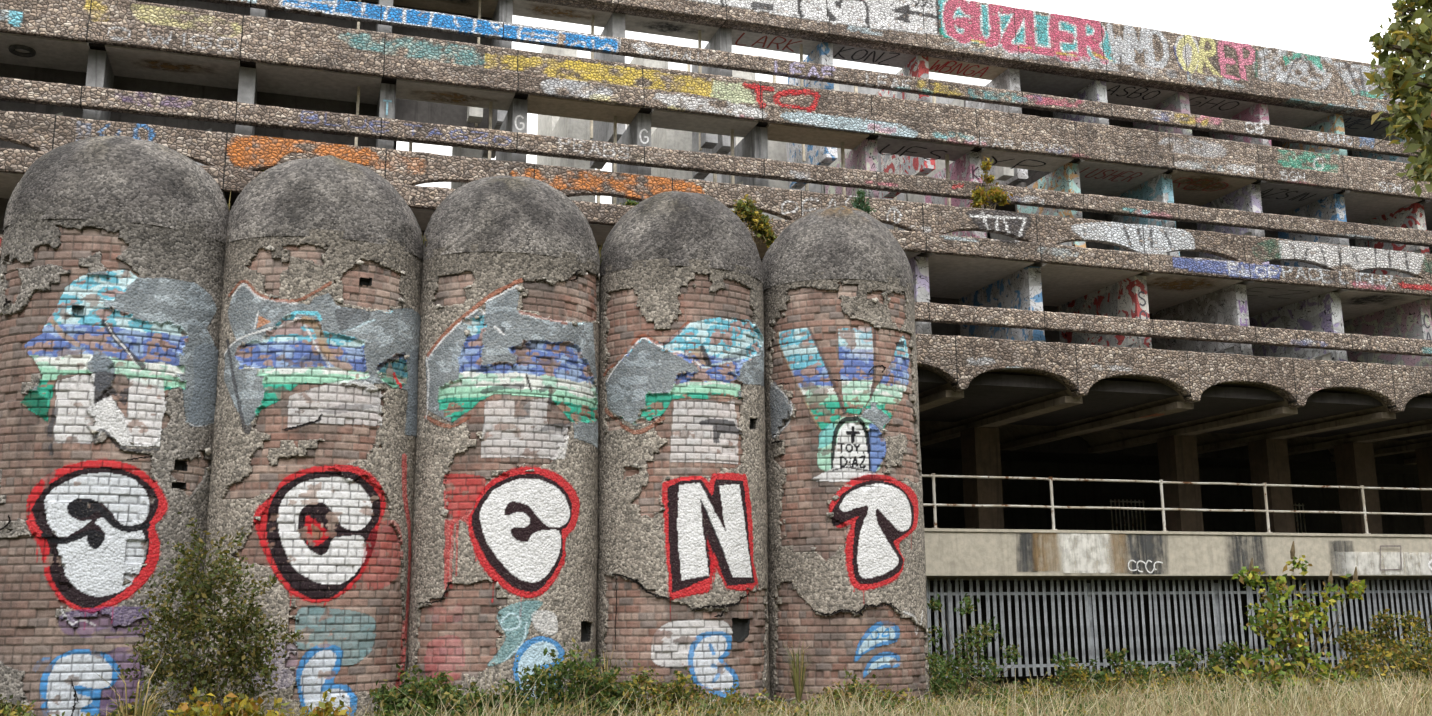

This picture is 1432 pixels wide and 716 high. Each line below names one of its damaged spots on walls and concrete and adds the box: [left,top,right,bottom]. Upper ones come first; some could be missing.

spalling [247,244,328,298]
spalling [334,259,406,310]
spalling [434,271,475,309]
spalling [515,271,753,387]
spalling [0,226,212,716]
spalling [224,373,391,500]
spalling [440,394,571,521]
spalling [597,384,756,518]
spalling [769,282,919,562]
spalling [230,495,507,700]